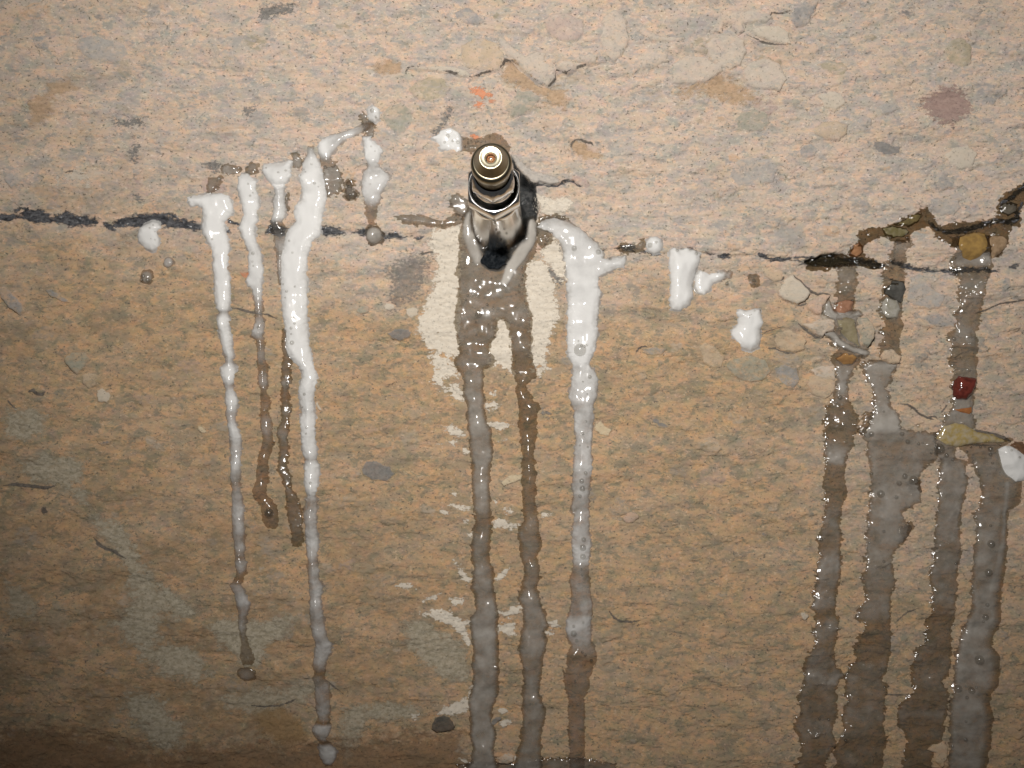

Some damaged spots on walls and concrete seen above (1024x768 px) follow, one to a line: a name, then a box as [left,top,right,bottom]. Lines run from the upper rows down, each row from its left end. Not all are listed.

crack [0,207,201,232]
crack [265,219,289,237]
crack [321,225,434,254]
damp [534,191,574,219]
crack [614,244,660,256]
crack [857,260,1019,276]
damp [415,224,466,402]
damp [521,235,568,378]
crack [691,248,833,354]
damp [486,317,516,376]
damp [495,605,524,636]
damp [395,583,473,716]